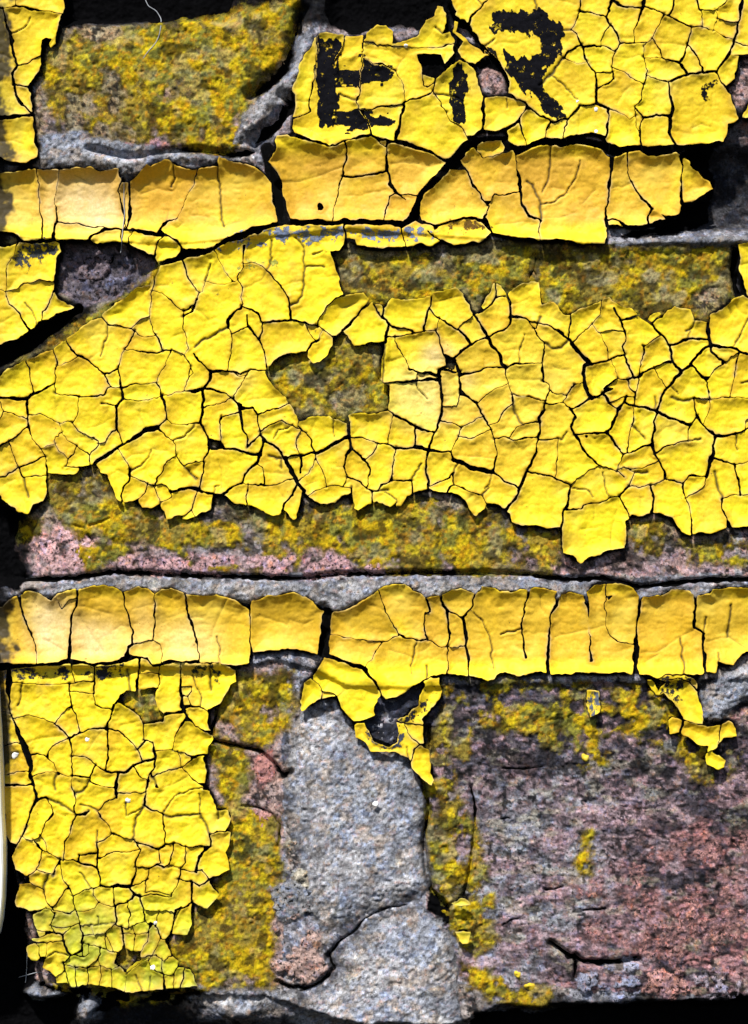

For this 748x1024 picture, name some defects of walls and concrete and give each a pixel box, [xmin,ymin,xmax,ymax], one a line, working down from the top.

crack [0,0,748,532]
peeling [0,0,748,563]
crack [56,908,85,978]
crack [102,833,213,932]
crack [277,904,406,991]
crack [0,569,748,844]
peeling [0,583,748,1003]
crack [549,940,637,974]